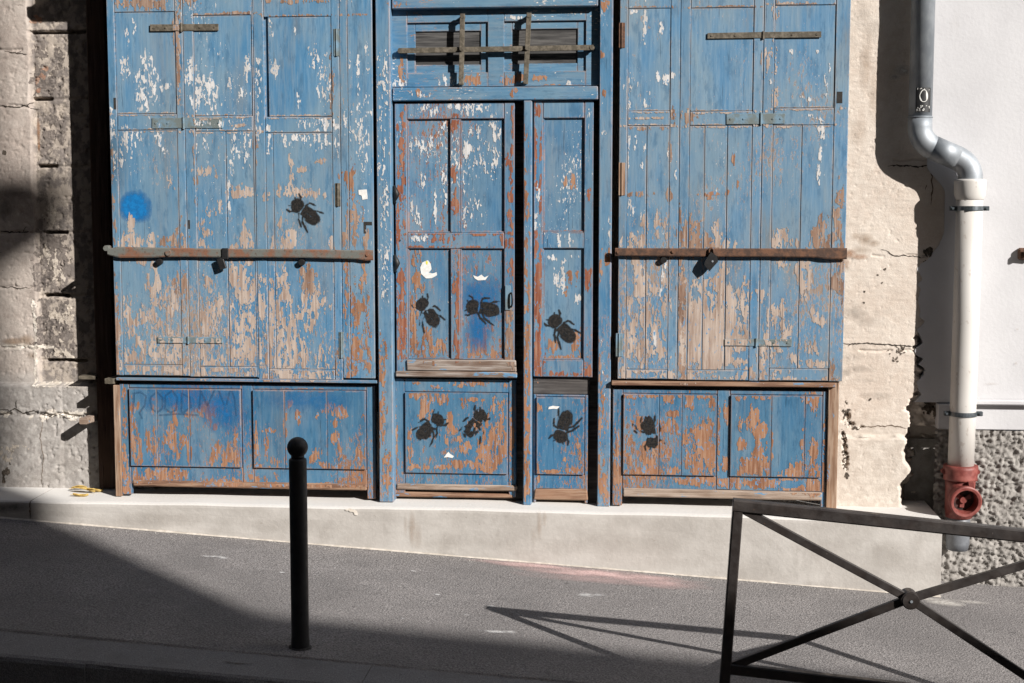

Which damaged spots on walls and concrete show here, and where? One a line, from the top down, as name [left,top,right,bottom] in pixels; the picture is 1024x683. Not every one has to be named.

peeling [110,0,846,505]
crack [844,342,920,350]
crack [1,402,77,516]
spalling [921,402,936,419]